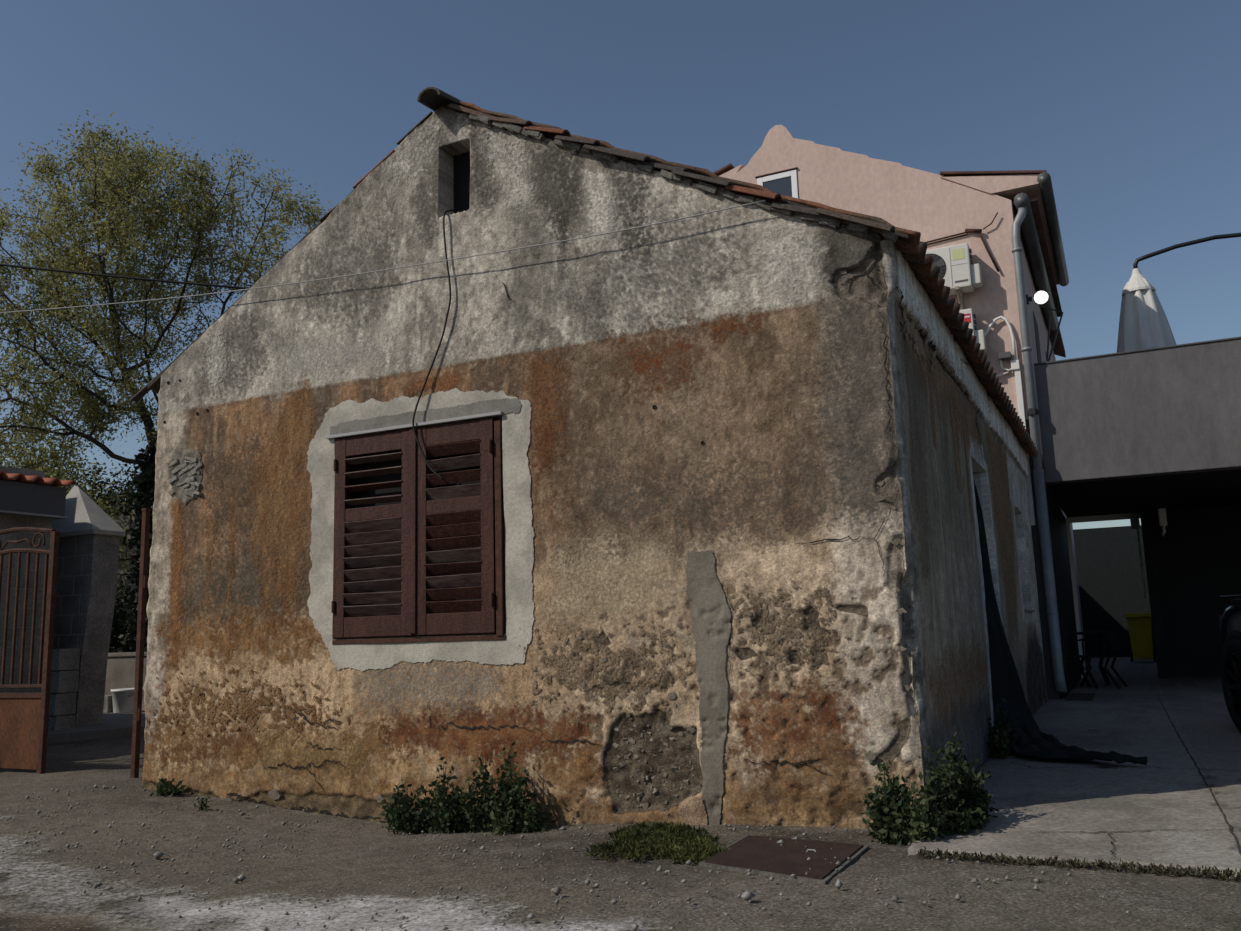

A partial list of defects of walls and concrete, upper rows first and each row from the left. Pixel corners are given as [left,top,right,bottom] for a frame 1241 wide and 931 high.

water stain [388,118,445,242]
water stain [196,218,402,399]
water stain [466,120,930,638]
spalling [166,456,204,497]
water stain [180,434,310,627]
spalling [513,614,708,825]
flaking render [720,569,868,698]
spalling [886,535,919,720]